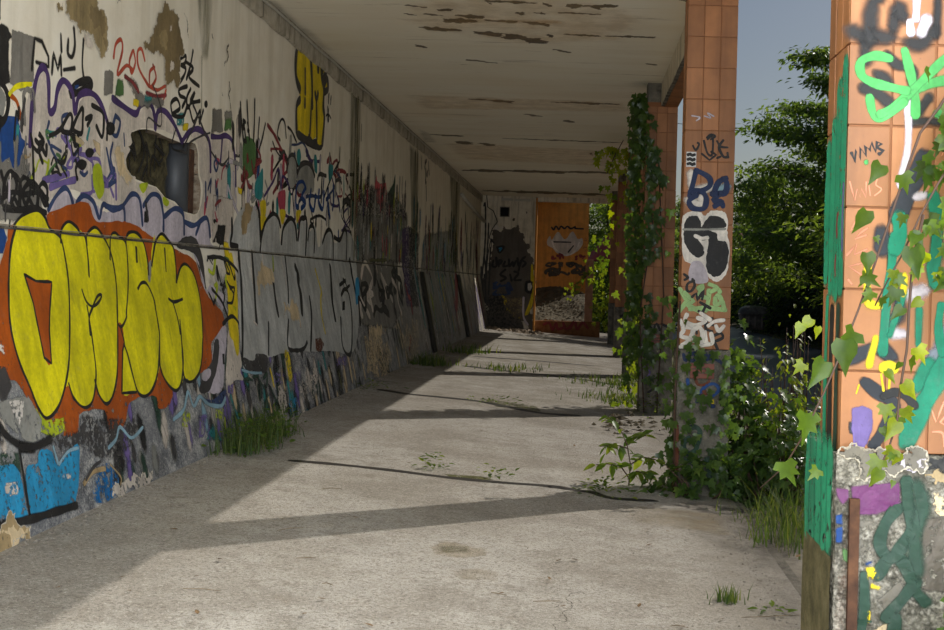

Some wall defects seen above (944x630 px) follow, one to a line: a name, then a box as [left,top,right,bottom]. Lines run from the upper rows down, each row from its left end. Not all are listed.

flaking render [57,0,109,59]
flaking render [143,0,185,90]
peeling [404,0,655,53]
spalling [114,129,201,214]
peeling [9,400,24,425]
flaking render [0,510,31,552]
spalling [836,442,944,592]
spalling [878,581,903,610]